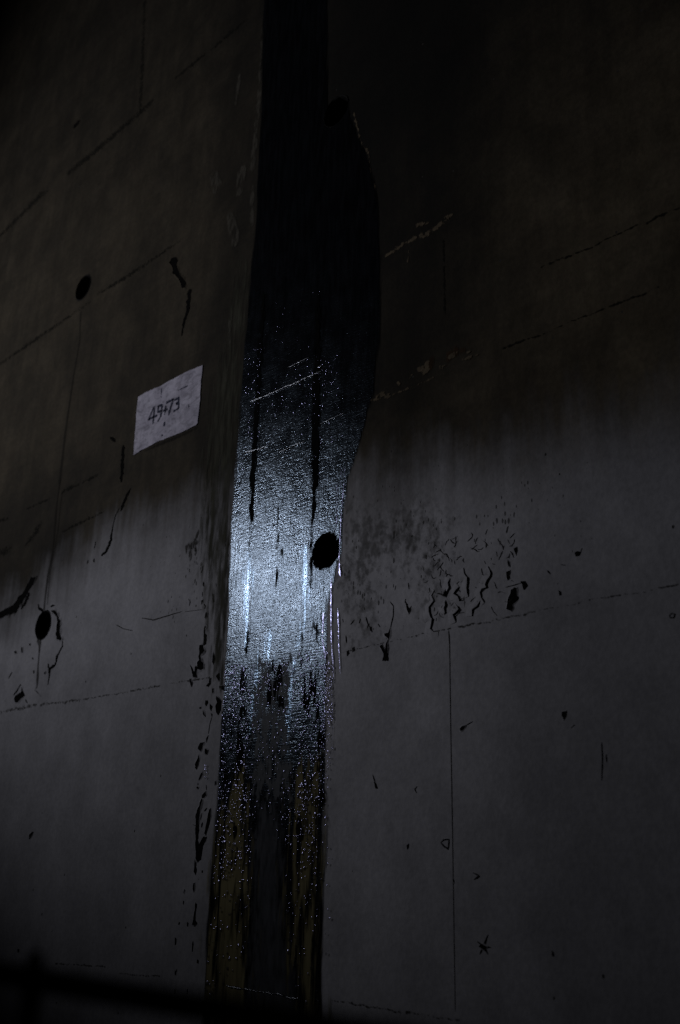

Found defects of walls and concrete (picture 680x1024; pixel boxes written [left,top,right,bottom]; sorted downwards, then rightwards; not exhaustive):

crack [169,257,192,336]
crack [87,437,131,564]
leakage [185,0,478,1009]
crack [38,604,64,684]
peeling [342,527,528,661]
spalling [178,568,224,927]